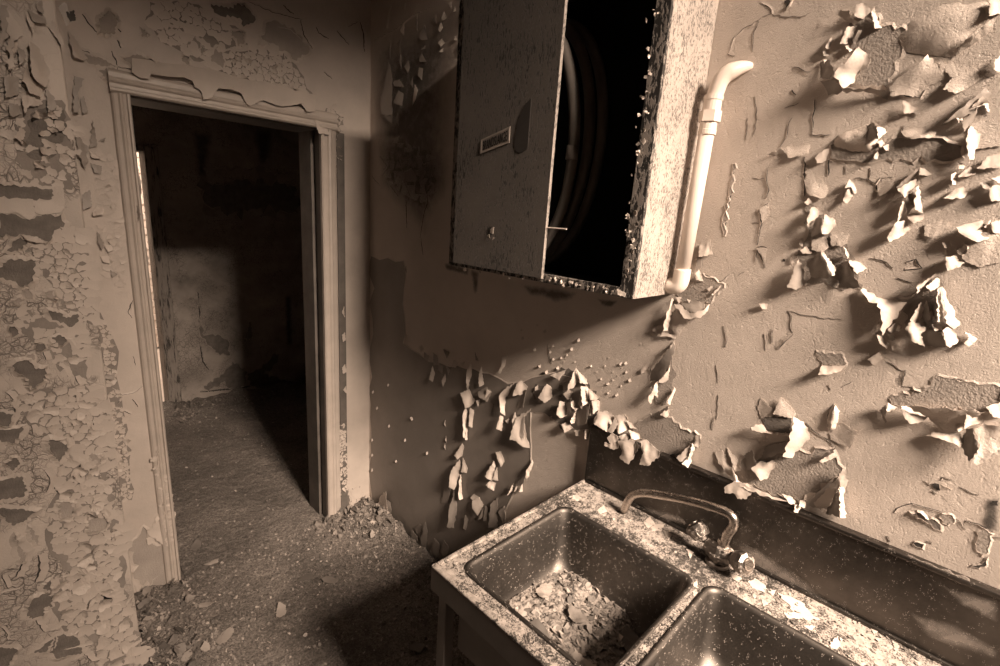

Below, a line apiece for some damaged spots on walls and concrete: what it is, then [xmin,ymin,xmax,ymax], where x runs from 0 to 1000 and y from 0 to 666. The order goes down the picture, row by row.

peeling [131,0,348,168]
peeling [820,3,950,115]
peeling [989,0,1000,16]
crack [720,67,892,277]
peeling [783,86,1000,365]
peeling [0,1,177,666]
peeling [370,240,731,530]
peeling [715,397,862,518]
peeling [814,349,849,375]
spalling [880,373,1000,465]
spalling [894,503,1000,584]
spalling [923,477,978,496]